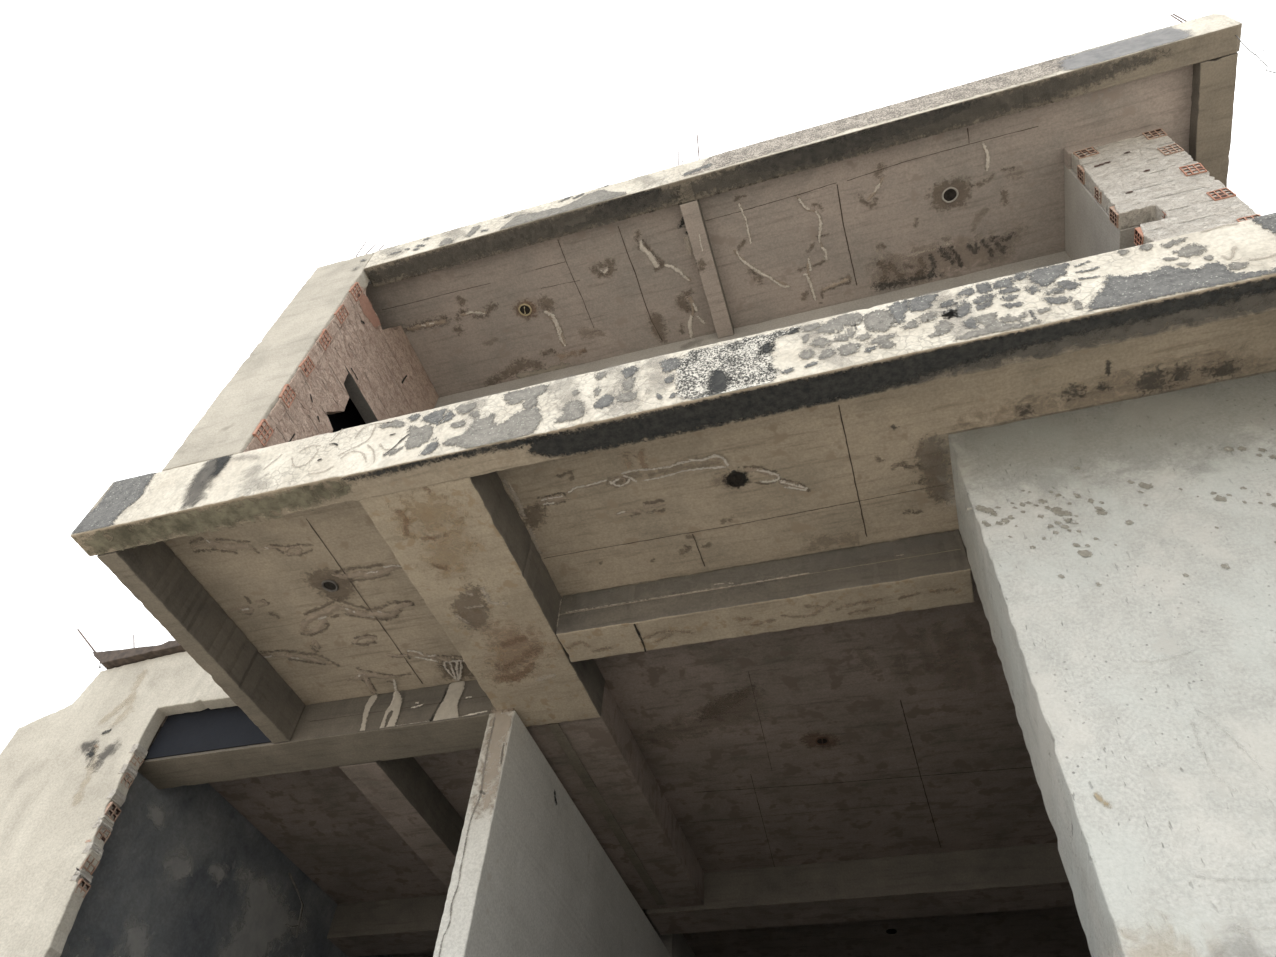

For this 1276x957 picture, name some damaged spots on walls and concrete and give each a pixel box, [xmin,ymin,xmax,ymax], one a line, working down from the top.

peeling [1251,212,1276,233]
spalling [359,294,381,329]
damp [71,49,1276,557]
peeling [780,223,1276,374]
crack [263,394,407,474]
peeling [378,365,639,456]
peeling [656,356,682,400]
damp [261,600,414,666]
damp [451,588,489,630]
damp [82,741,116,767]
damp [347,650,513,814]